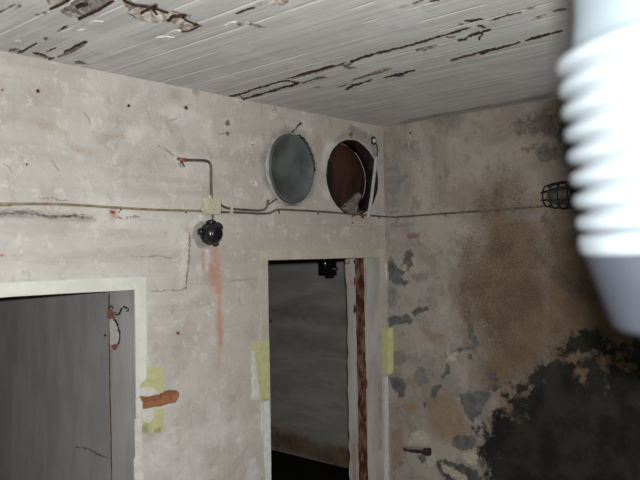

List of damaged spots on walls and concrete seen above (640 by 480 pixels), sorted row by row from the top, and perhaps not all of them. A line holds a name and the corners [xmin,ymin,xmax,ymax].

spalling [122,0,202,41]
crack [229,18,563,113]
crack [130,230,191,293]
corrosion [201,246,226,374]
corrosion [350,258,369,480]
leakage [377,377,406,473]
peeling [384,376,407,480]
peeling [385,249,431,328]
peeling [413,322,480,407]
peeling [417,434,482,480]
peeling [460,372,502,423]
leakage [404,160,640,480]